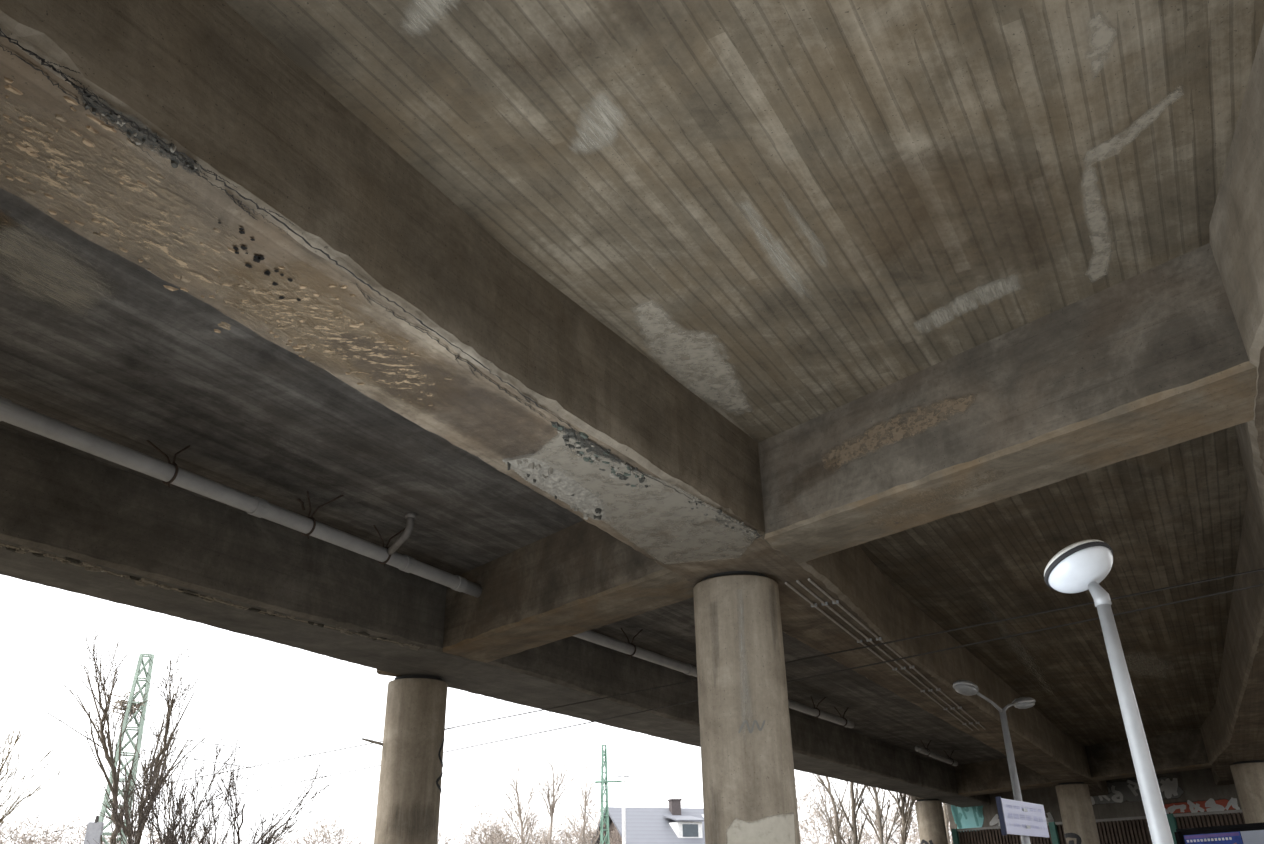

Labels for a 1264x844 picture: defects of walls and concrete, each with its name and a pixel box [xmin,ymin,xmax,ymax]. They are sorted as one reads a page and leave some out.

peeling [0,77,453,406]
crack [0,28,757,534]
spalling [551,421,648,488]